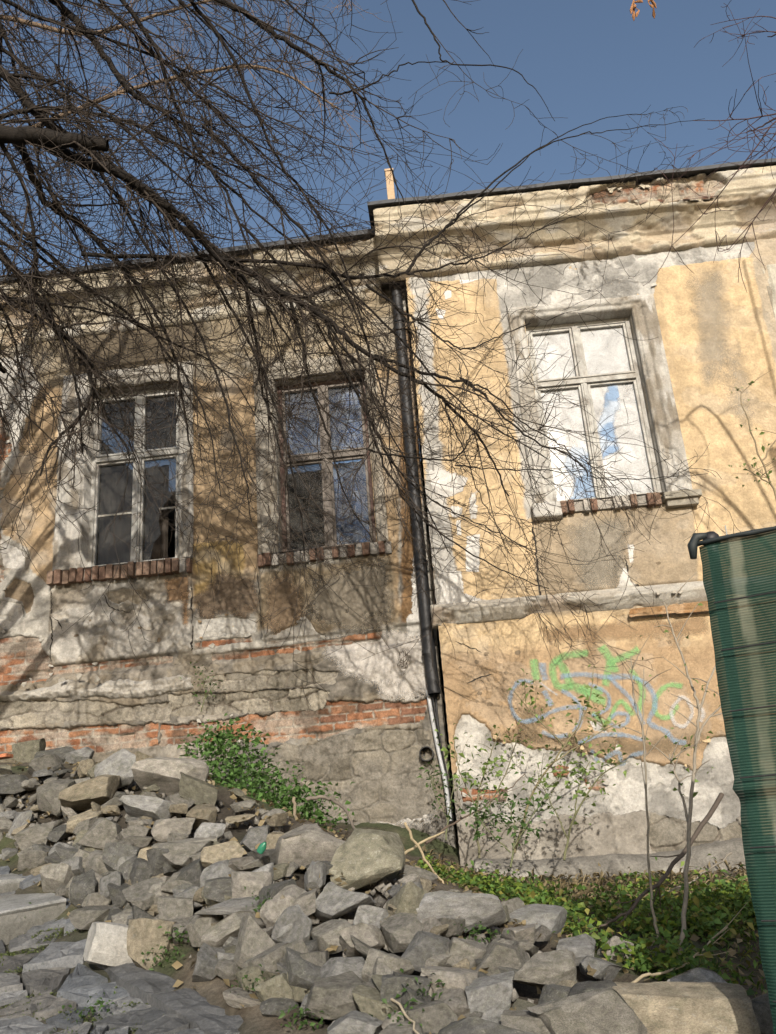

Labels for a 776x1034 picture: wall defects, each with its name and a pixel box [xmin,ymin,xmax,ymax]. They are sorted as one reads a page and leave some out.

flaking render [585,177,725,208]
flaking render [418,242,755,319]
peeling [0,353,39,495]
flaking render [0,534,34,614]
peeling [425,469,483,604]
flaking render [0,636,54,686]
flaking render [0,698,428,753]
flaking render [454,714,741,829]